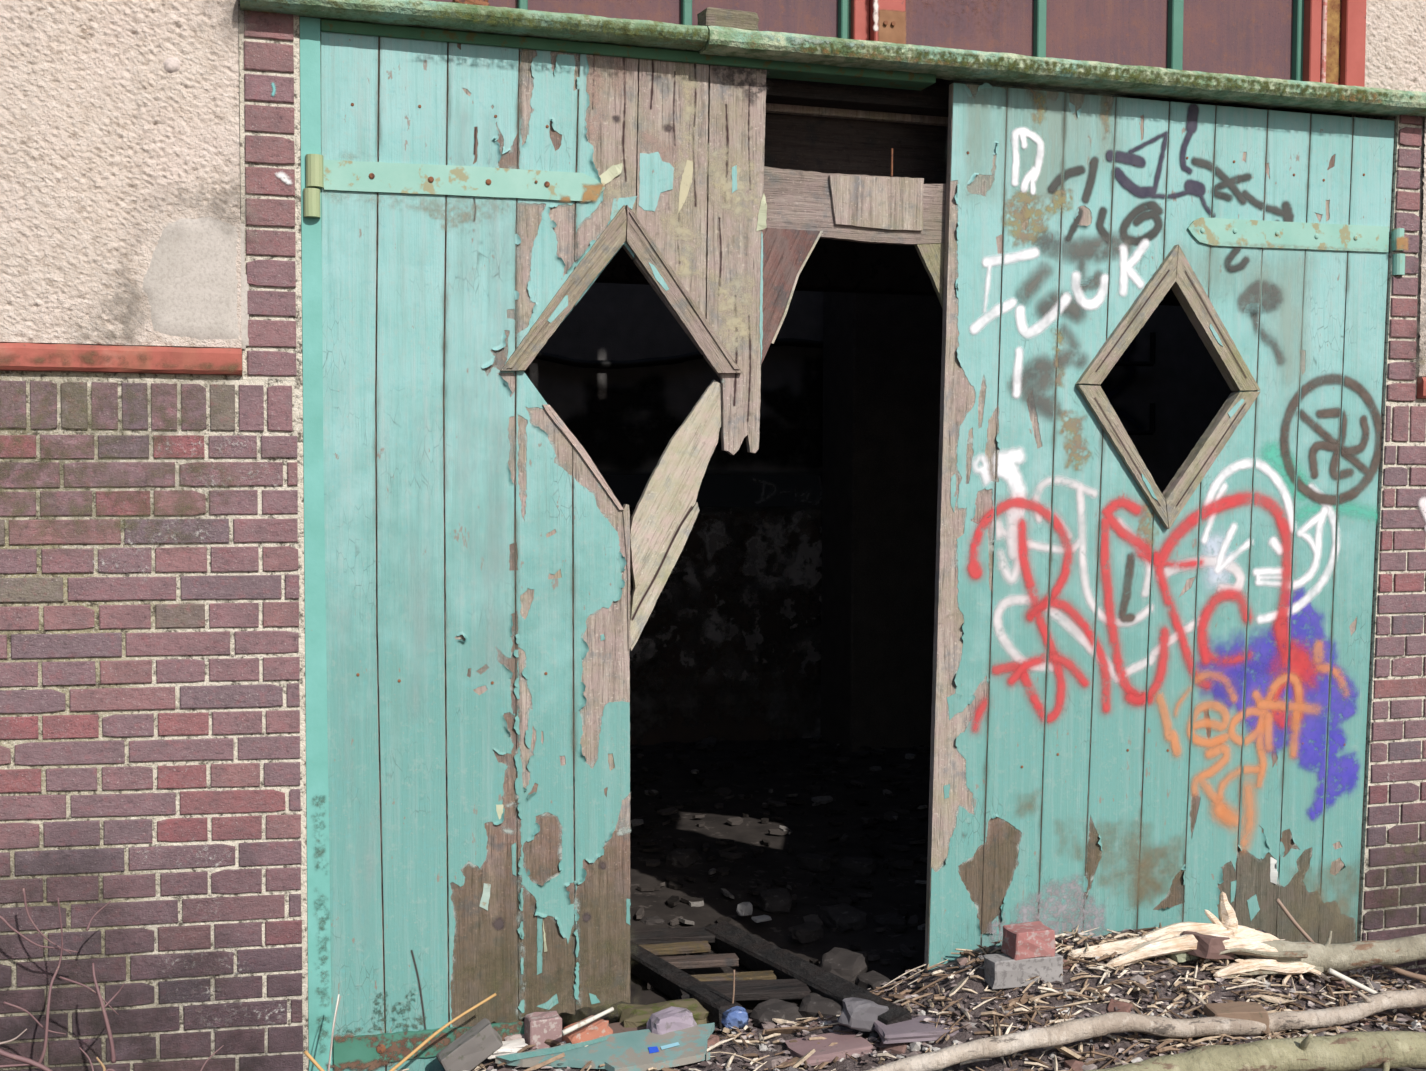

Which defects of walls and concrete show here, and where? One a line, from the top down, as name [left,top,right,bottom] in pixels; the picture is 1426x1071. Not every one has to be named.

rust [854,10,906,59]
peeling [473,49,823,469]
peeling [931,173,1022,937]
spalling [450,407,822,1027]
peeling [1083,815,1103,900]
peeling [1153,865,1186,912]
peeling [1189,789,1200,838]
peeling [1216,825,1356,944]